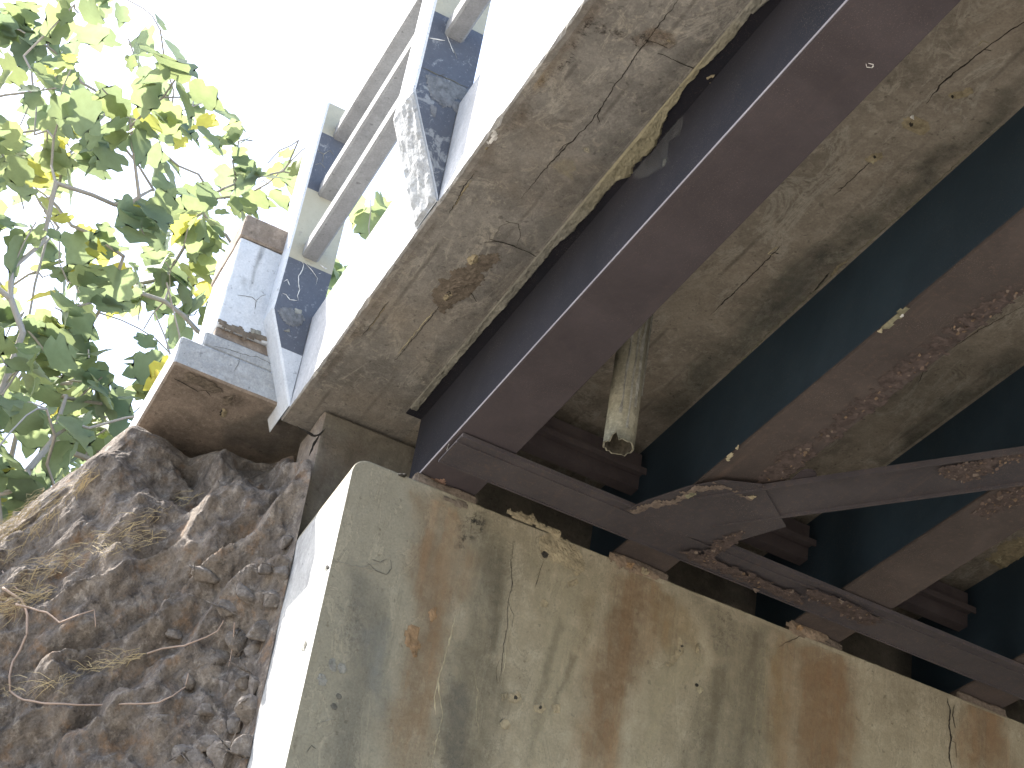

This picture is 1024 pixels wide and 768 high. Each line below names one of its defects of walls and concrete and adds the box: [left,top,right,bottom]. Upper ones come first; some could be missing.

crack [522,0,694,197]
crack [477,221,536,260]
peeling [218,319,267,341]
crack [394,300,443,361]
spalling [507,508,585,587]
crack [496,551,544,684]
crack [947,699,957,768]